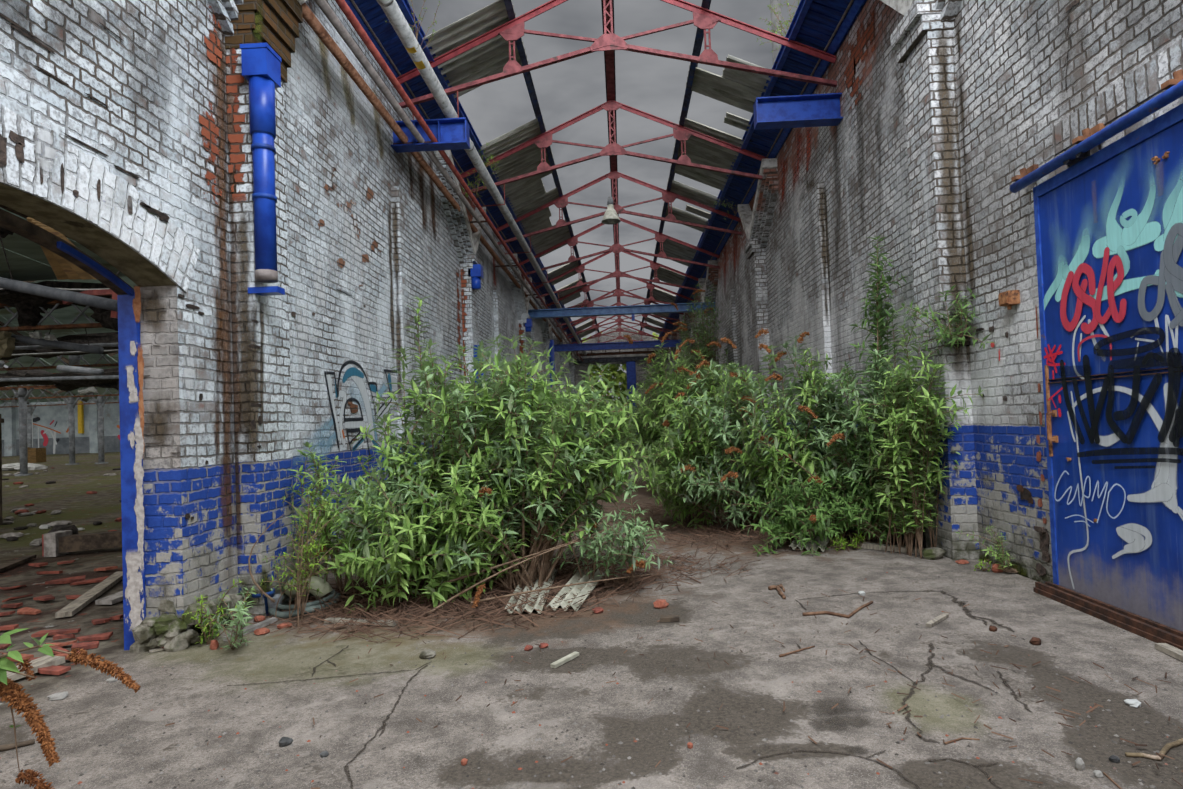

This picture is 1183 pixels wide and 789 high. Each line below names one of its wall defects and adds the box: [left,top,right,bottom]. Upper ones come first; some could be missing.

peeling [198,4,246,204]
corrosion [320,40,354,122]
corrosion [408,152,436,240]
corrosion [213,25,241,542]
peeling [125,341,138,402]
peeling [1036,411,1045,482]
spalling [124,418,244,653]
spalling [991,485,1051,576]
crack [796,591,902,610]
crack [941,591,1014,632]
crack [227,645,430,789]
crack [737,640,1032,789]